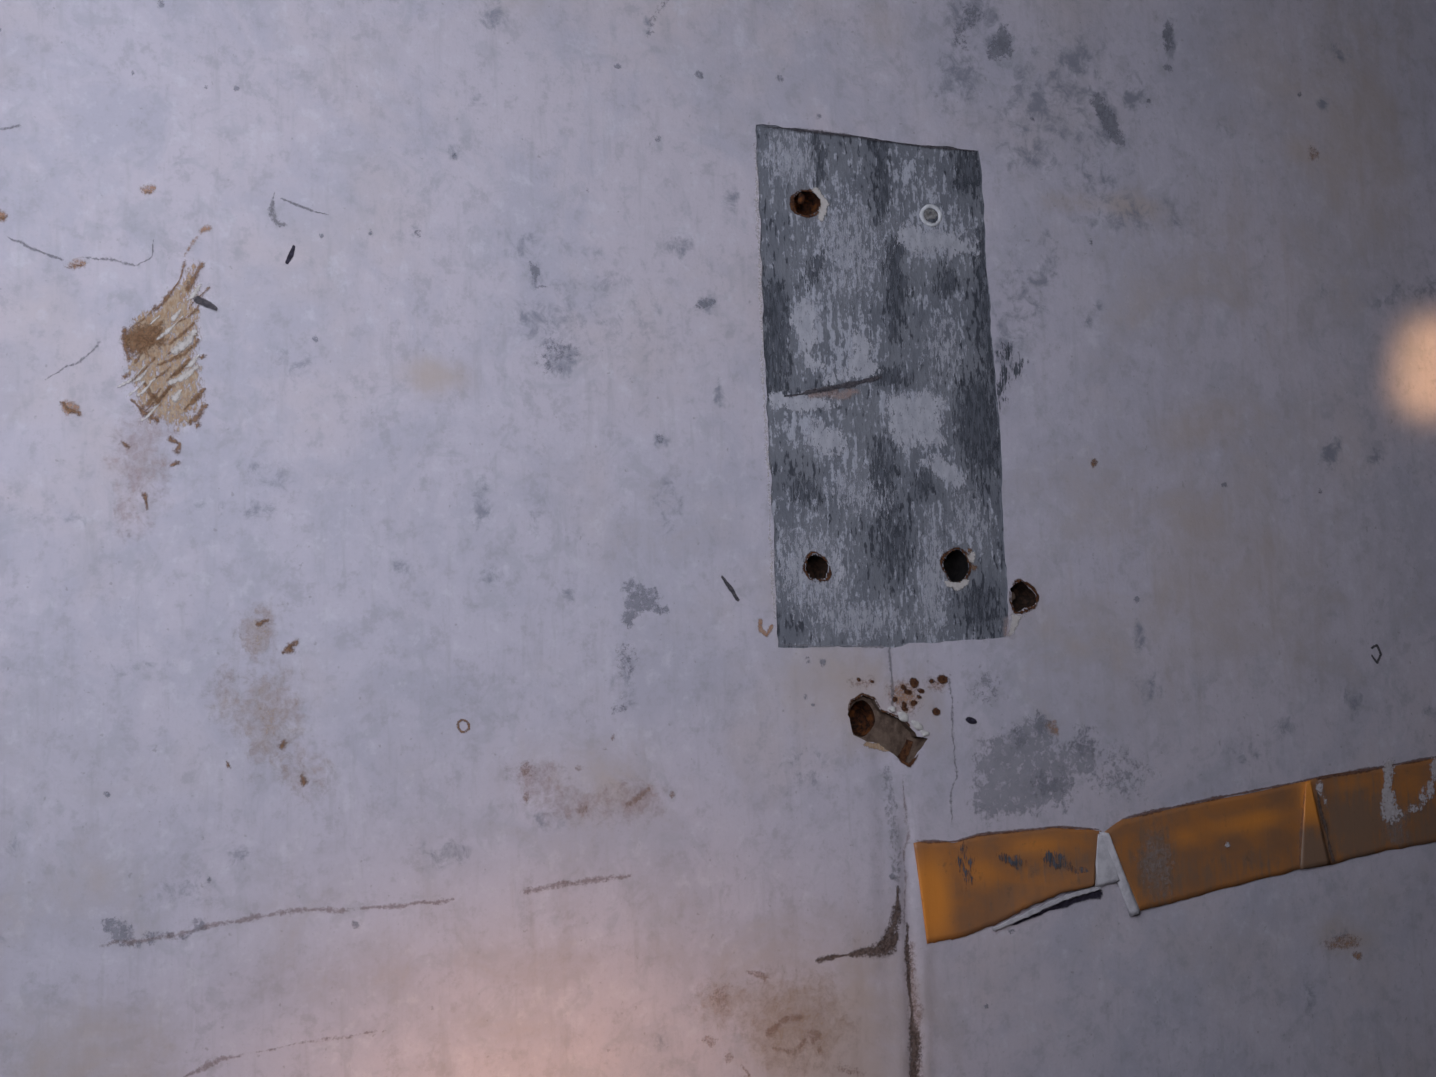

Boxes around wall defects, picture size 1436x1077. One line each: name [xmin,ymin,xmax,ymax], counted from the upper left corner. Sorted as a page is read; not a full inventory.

crack [887,648,895,705]
crack [103,919,205,947]
crack [815,777,922,1077]